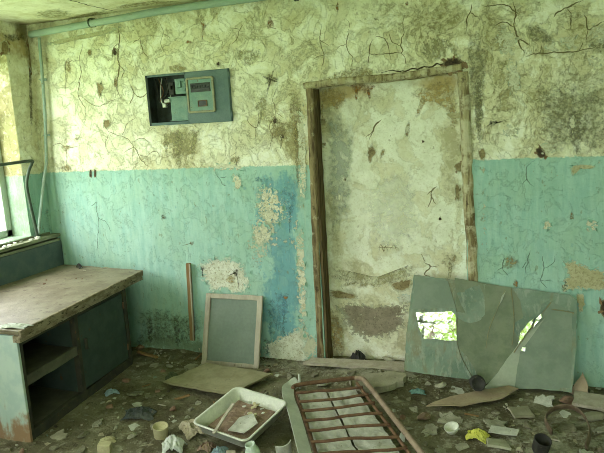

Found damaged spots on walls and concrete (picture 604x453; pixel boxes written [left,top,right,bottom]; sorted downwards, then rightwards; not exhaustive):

crack [68,31,148,120]
crack [368,15,448,74]
water stain [470,45,485,132]
crack [466,0,604,57]
crack [105,118,160,166]
crack [247,93,282,149]
water stain [543,89,604,153]
peeling [250,184,287,247]
peeling [196,254,253,295]
peeling [262,222,311,361]
crack [522,253,555,288]
peeling [560,255,604,317]